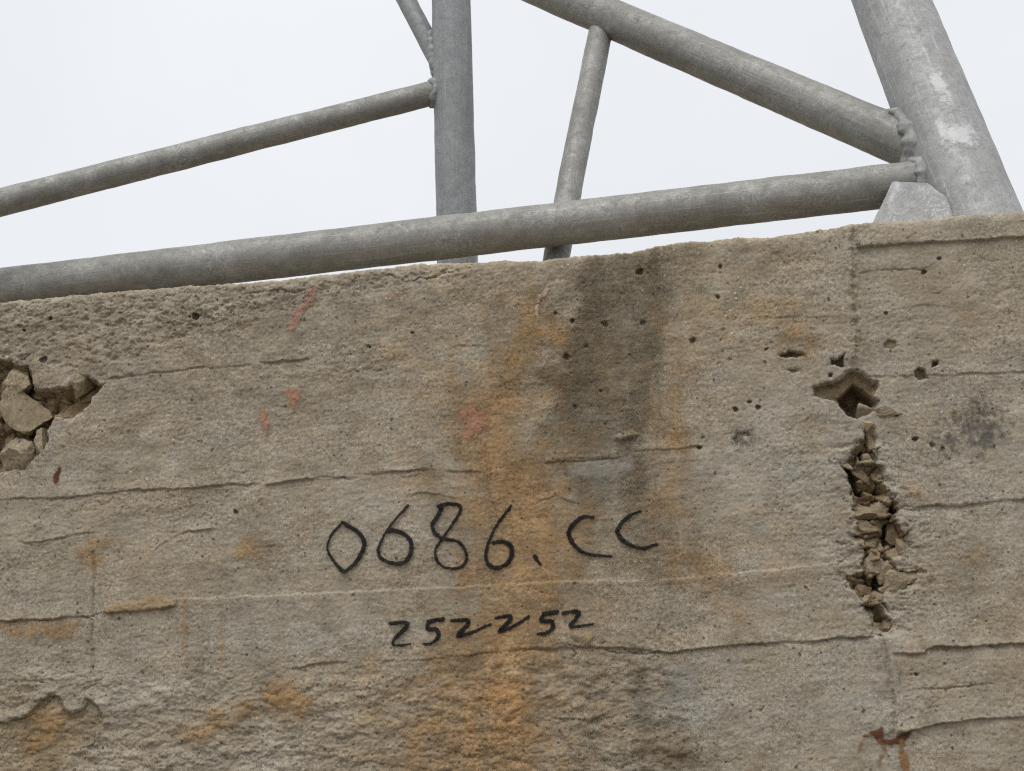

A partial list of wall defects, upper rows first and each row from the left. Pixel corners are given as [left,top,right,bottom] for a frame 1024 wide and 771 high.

leakage [535,249,663,496]
corrosion [422,294,577,771]
corrosion [858,727,912,771]